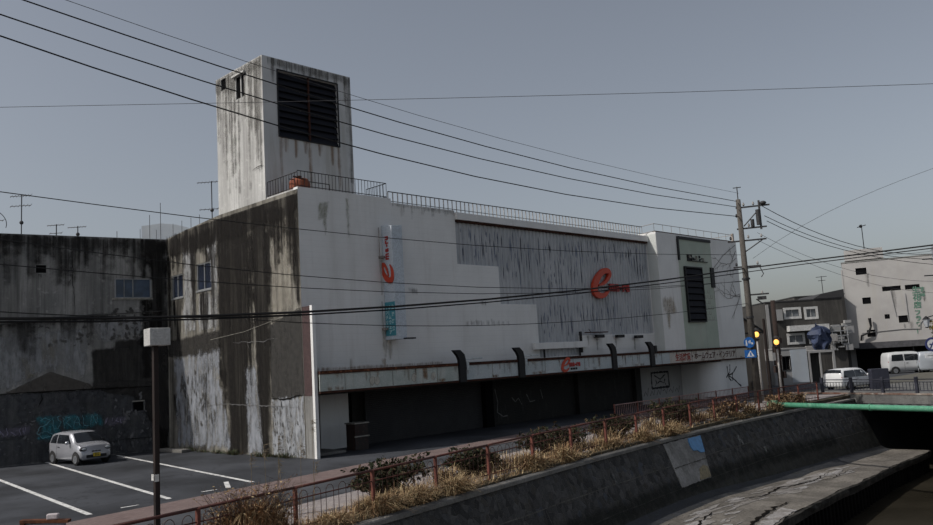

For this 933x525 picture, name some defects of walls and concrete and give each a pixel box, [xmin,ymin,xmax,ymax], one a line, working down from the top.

damp [217,56,262,158]
damp [271,57,350,87]
damp [0,193,304,466]
peeling [174,351,230,449]
peeling [246,367,262,454]
peeling [271,396,306,457]
crack [743,473,842,525]